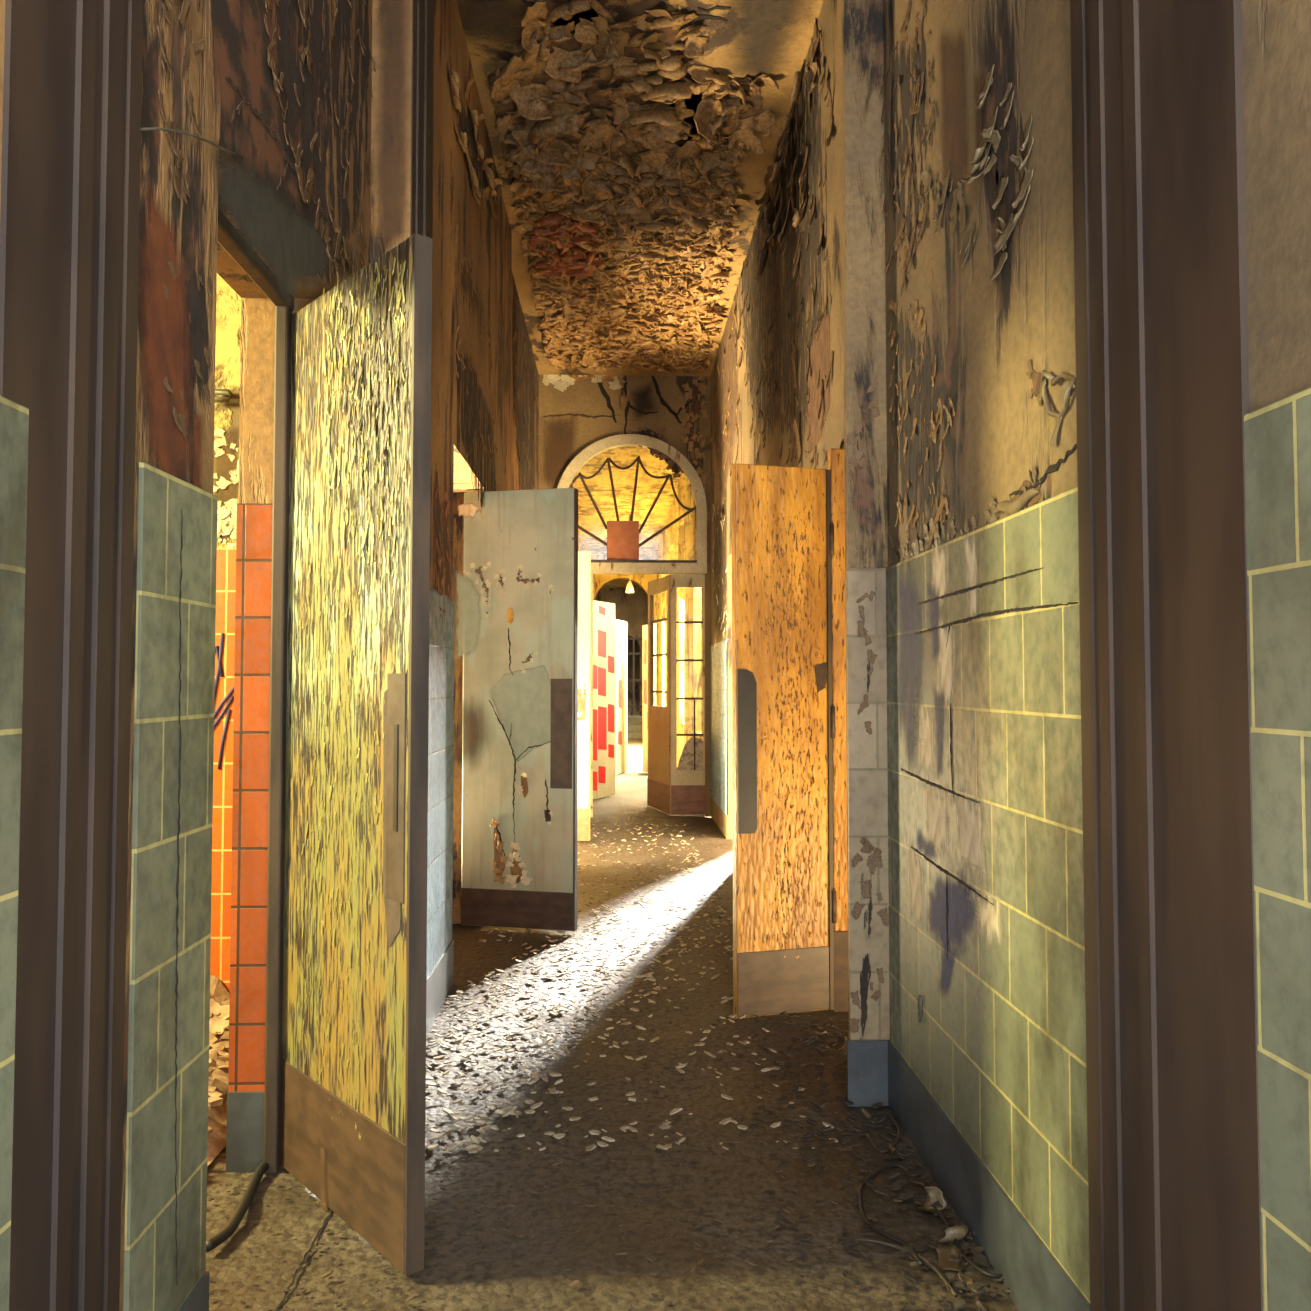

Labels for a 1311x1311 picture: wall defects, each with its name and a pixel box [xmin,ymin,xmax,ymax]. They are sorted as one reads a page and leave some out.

peeling [846,0,1046,566]
peeling [434,0,834,650]
crack [543,375,692,434]
crack [914,567,1078,647]
peeling [518,772,528,798]
leakage [917,834,934,857]
leakage [939,951,954,992]